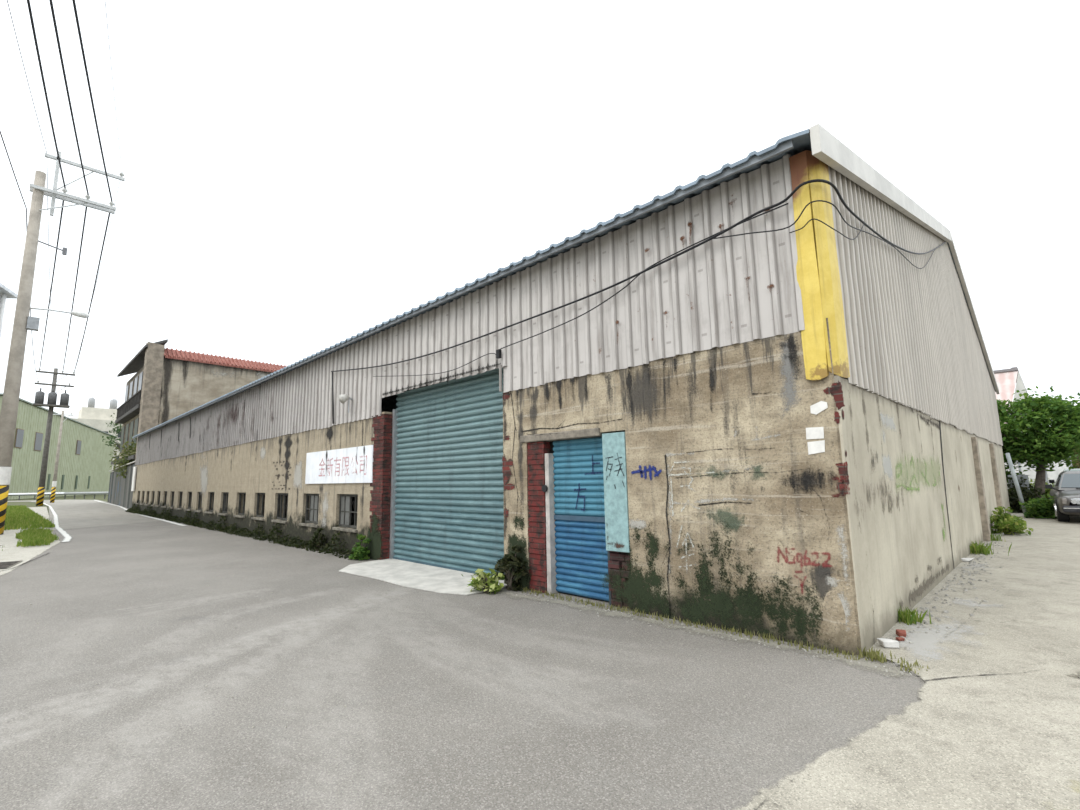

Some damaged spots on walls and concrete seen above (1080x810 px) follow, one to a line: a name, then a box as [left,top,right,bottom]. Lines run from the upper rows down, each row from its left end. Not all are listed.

leakage [781,335,799,372]
leakage [604,357,677,424]
spalling [823,380,845,423]
leakage [516,375,587,503]
leakage [279,435,299,513]
leakage [785,470,832,491]
spalling [829,451,850,497]
leakage [810,565,832,599]